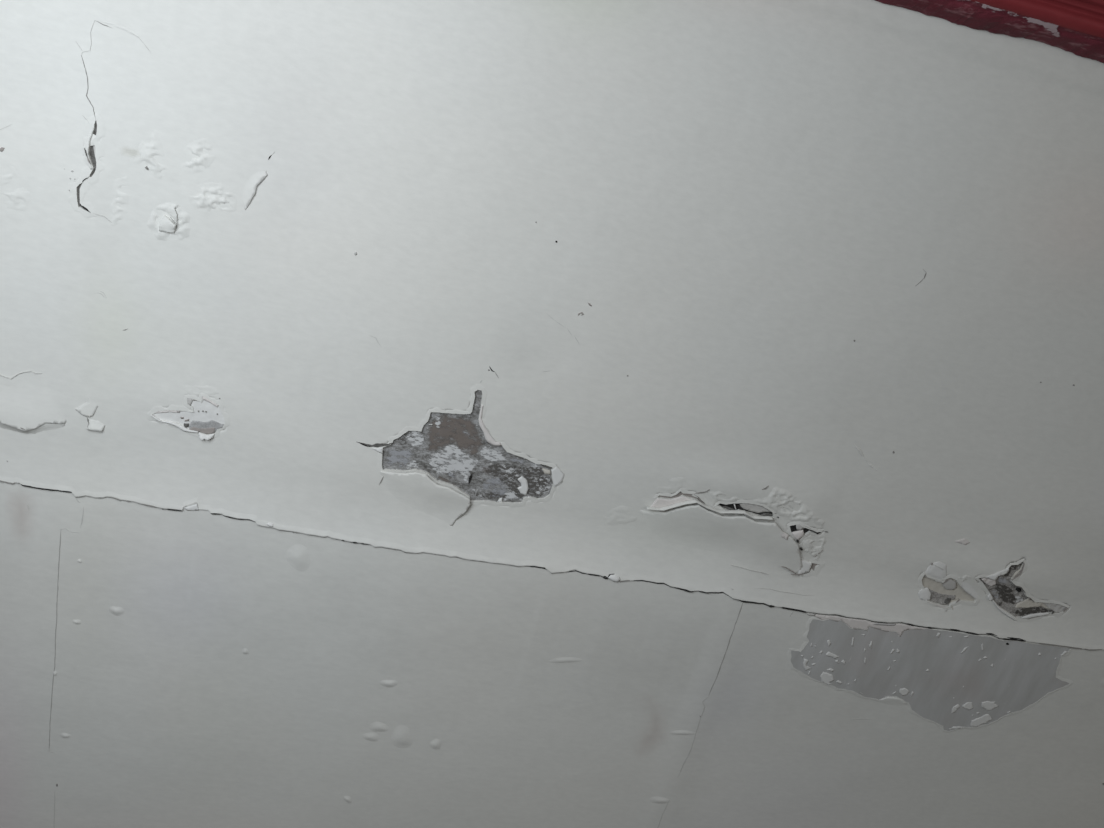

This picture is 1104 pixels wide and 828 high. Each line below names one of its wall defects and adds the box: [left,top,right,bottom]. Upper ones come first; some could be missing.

crack [64,20,151,223]
flaking render [146,385,230,440]
flaking render [358,384,564,526]
flaking render [602,477,827,578]
crack [0,475,1104,776]
peeling [787,613,1074,733]
flaking render [917,558,1070,622]